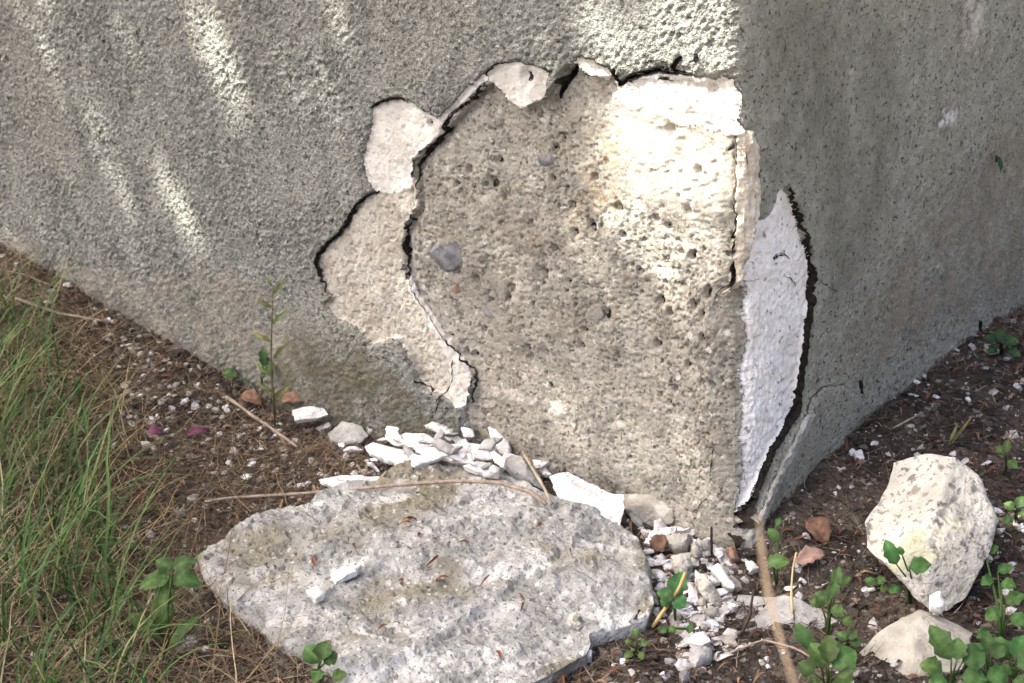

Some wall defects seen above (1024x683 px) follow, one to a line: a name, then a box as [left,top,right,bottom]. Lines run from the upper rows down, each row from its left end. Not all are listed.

crack [313,191,380,292]
crack [370,97,408,108]
crack [402,56,701,421]
spalling [319,57,808,592]
crack [715,135,758,297]
crack [727,187,839,549]